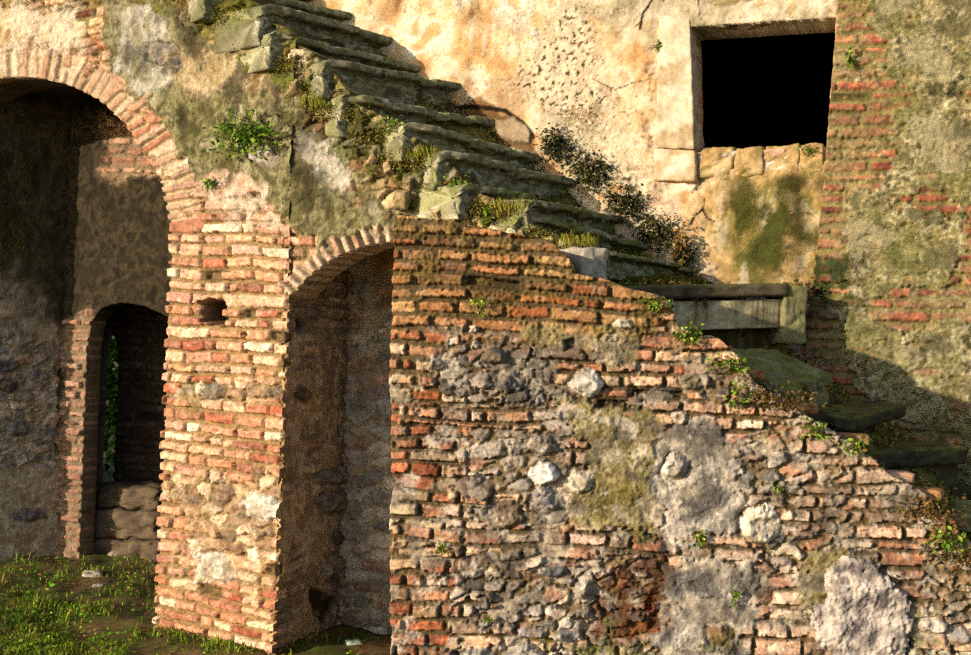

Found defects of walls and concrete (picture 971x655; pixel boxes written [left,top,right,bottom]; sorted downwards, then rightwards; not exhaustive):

damp [470,0,535,55]
crack [636,0,652,30]
mould [729,176,819,273]
flaking render [837,0,971,485]